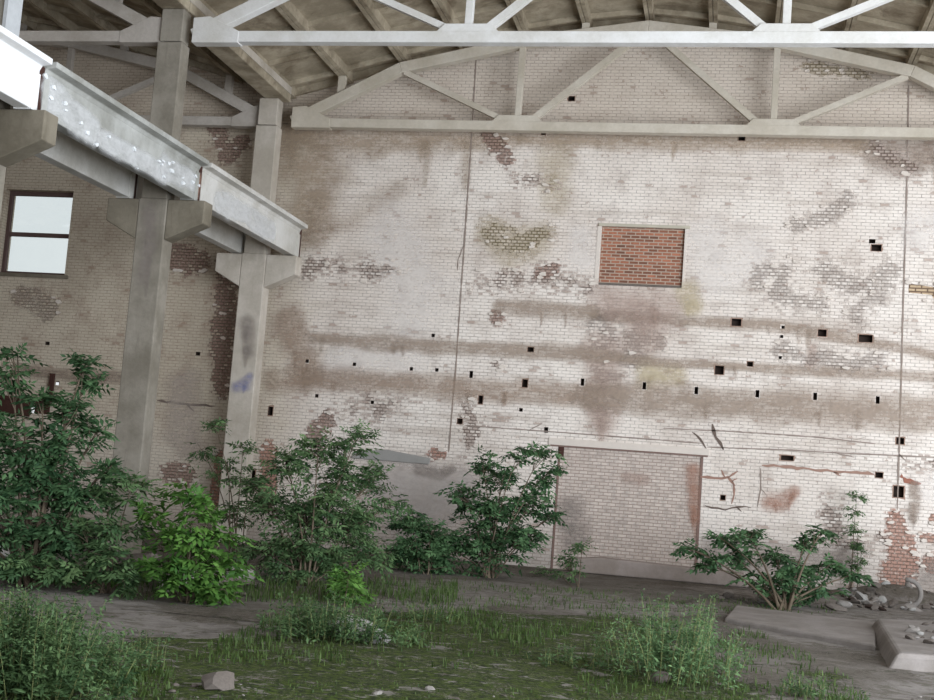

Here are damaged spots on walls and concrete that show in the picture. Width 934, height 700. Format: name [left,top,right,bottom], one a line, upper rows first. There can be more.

spalling [170,243,238,400]
damp [496,288,934,359]
spalling [905,281,934,302]
damp [280,312,934,426]
spalling [892,485,906,500]
spalling [902,454,934,473]
spalling [811,493,934,586]